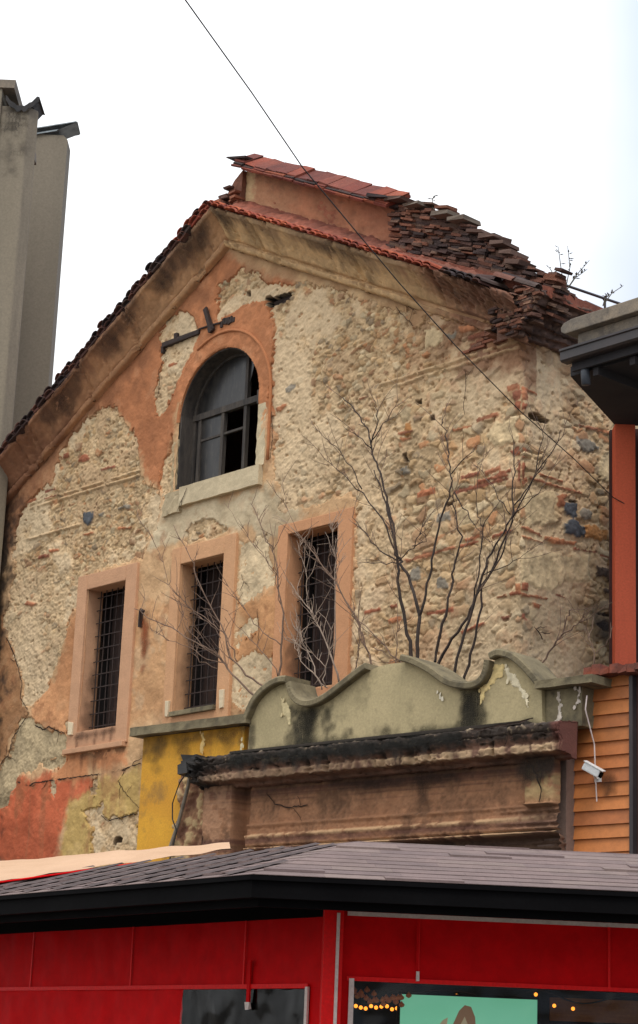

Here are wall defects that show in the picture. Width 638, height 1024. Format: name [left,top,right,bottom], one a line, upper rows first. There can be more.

flaking render [154,311,198,417]
flaking render [215,268,614,725]
flaking render [0,404,174,809]
crack [0,638,142,824]
flaking render [82,776,139,853]
crack [267,794,306,821]
leakage [289,707,329,745]
leakage [453,689,484,728]
leakage [519,757,554,781]